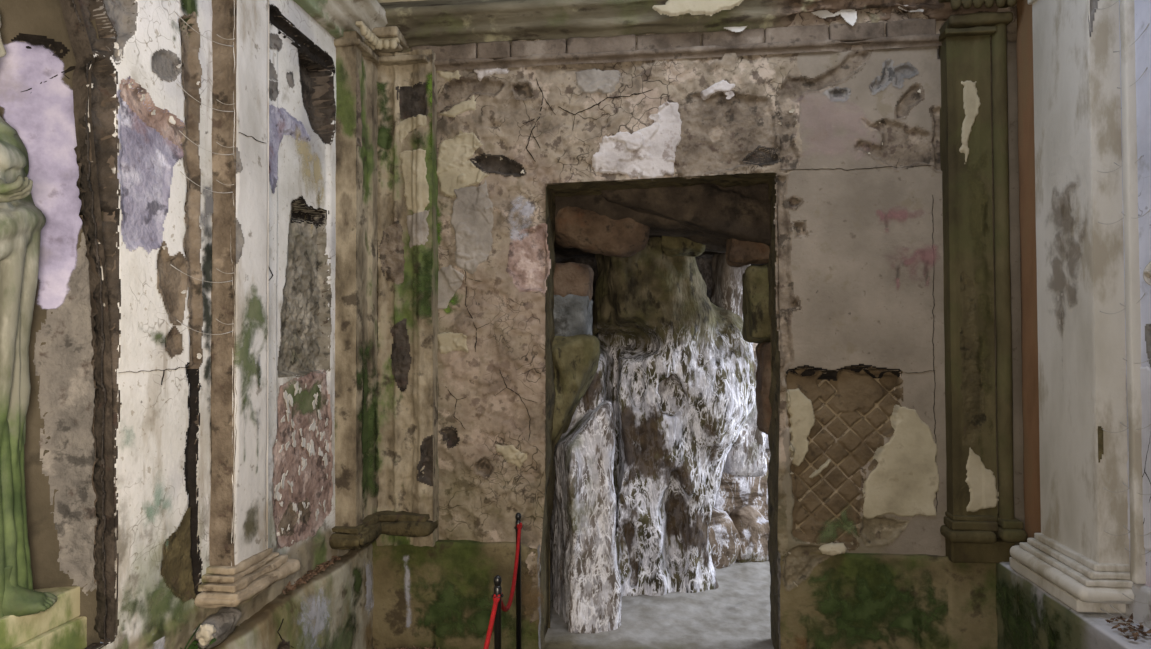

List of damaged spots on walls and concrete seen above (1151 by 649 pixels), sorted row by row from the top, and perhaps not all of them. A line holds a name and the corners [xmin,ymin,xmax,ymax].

spalling [11,33,70,58]
spalling [269,4,336,194]
spalling [470,153,527,177]
crack [523,79,653,162]
spalling [33,0,244,645]
peeling [273,195,333,549]
spalling [674,49,948,591]